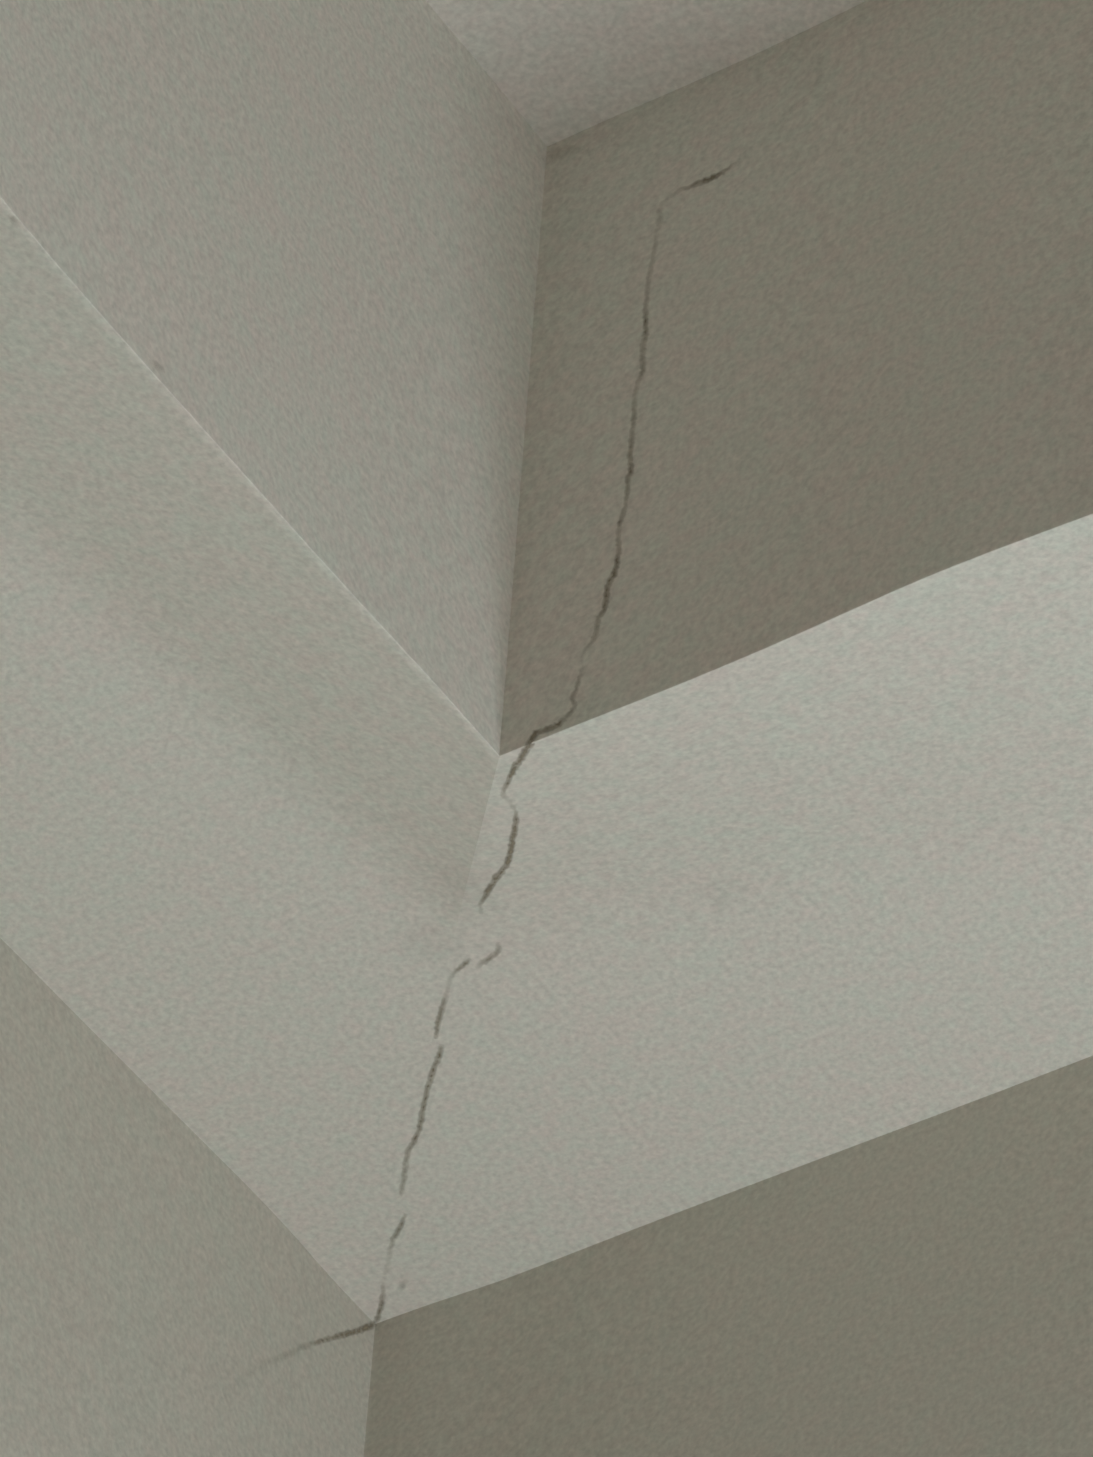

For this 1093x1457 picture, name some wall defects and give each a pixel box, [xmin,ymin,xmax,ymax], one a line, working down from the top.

crack [695,172,722,184]
crack [603,522,620,611]
crack [483,721,561,900]
crack [409,1009,442,1149]
crack [322,1302,383,1341]